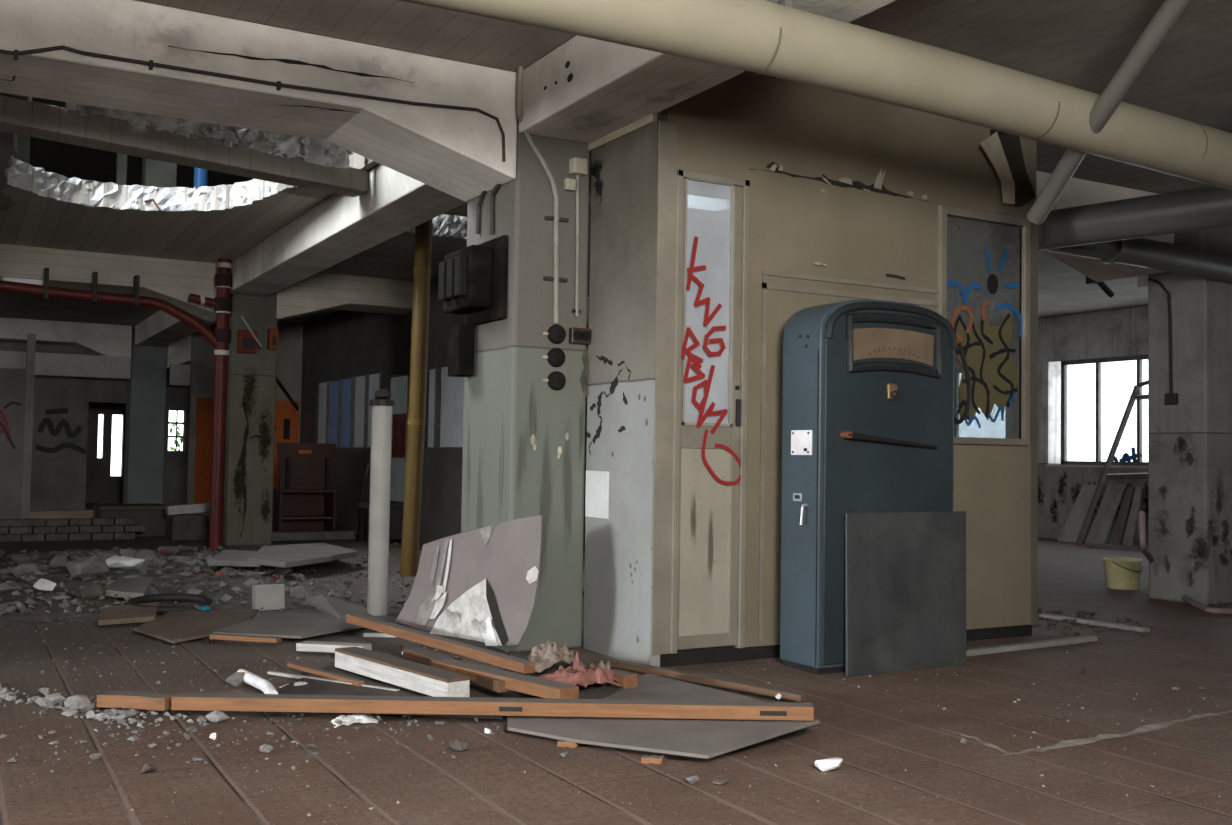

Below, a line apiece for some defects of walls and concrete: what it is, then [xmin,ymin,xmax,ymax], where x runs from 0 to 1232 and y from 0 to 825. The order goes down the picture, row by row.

spalling [65,102,353,169]
spalling [7,158,295,211]
crack [940,710,1232,756]